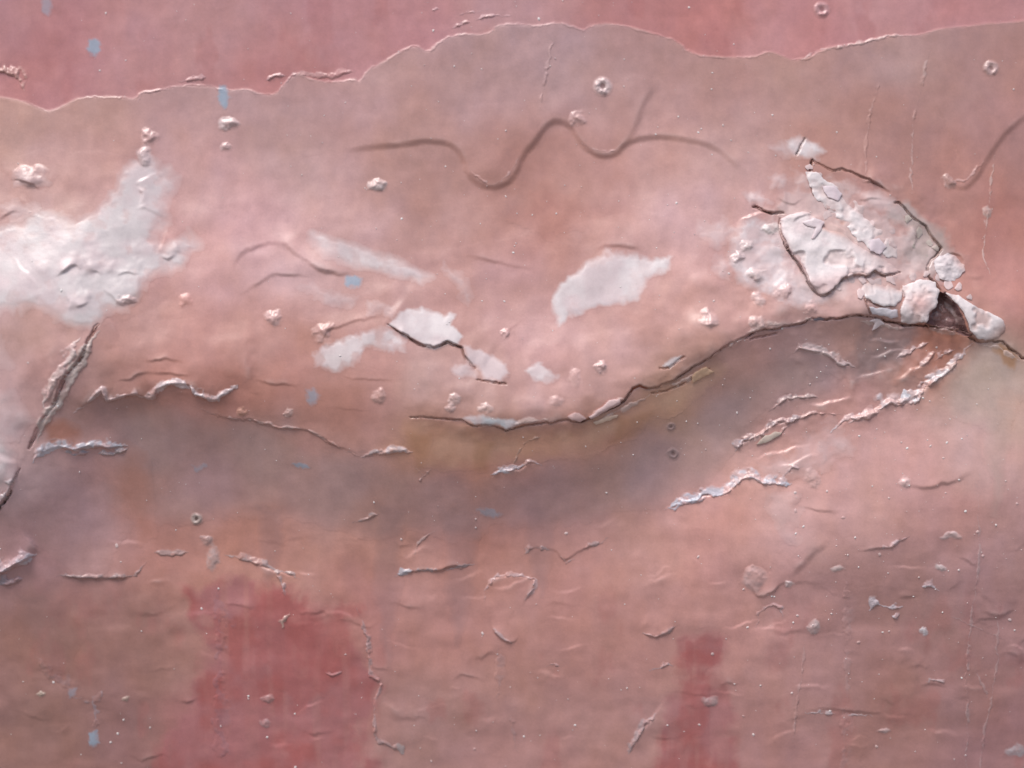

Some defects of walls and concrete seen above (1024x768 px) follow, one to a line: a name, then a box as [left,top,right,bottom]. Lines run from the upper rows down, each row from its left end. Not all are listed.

peeling [0,8,1024,112]
peeling [0,145,206,333]
peeling [296,228,561,385]
crack [387,324,507,384]
peeling [550,246,674,328]
crack [410,206,1024,432]
peeling [695,133,1005,451]
crack [4,324,100,504]
peeling [32,436,129,464]
peeling [72,377,413,458]
peeling [663,464,803,512]